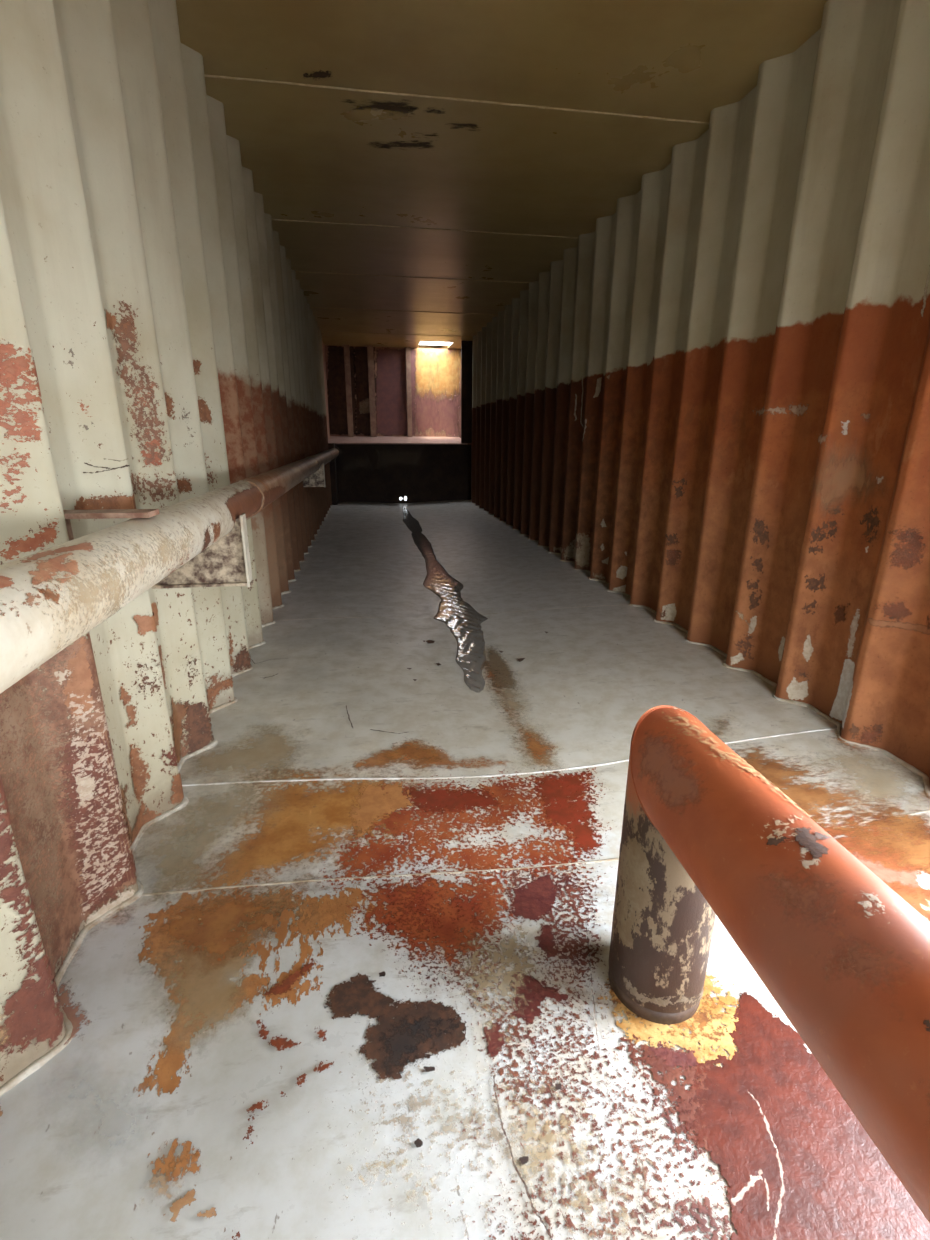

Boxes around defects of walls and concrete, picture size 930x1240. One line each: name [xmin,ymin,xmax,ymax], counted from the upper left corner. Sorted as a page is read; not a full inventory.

peeling [0,300,212,617]
peeling [120,603,167,729]
peeling [730,611,757,666]
peeling [786,635,814,700]
peeling [829,609,860,728]
rust [171,698,189,763]
peeling [0,630,252,1058]
rust [120,785,133,840]
rust [732,723,930,922]
rust [133,741,617,1097]
rust [57,984,90,1044]
rust [243,1060,334,1149]